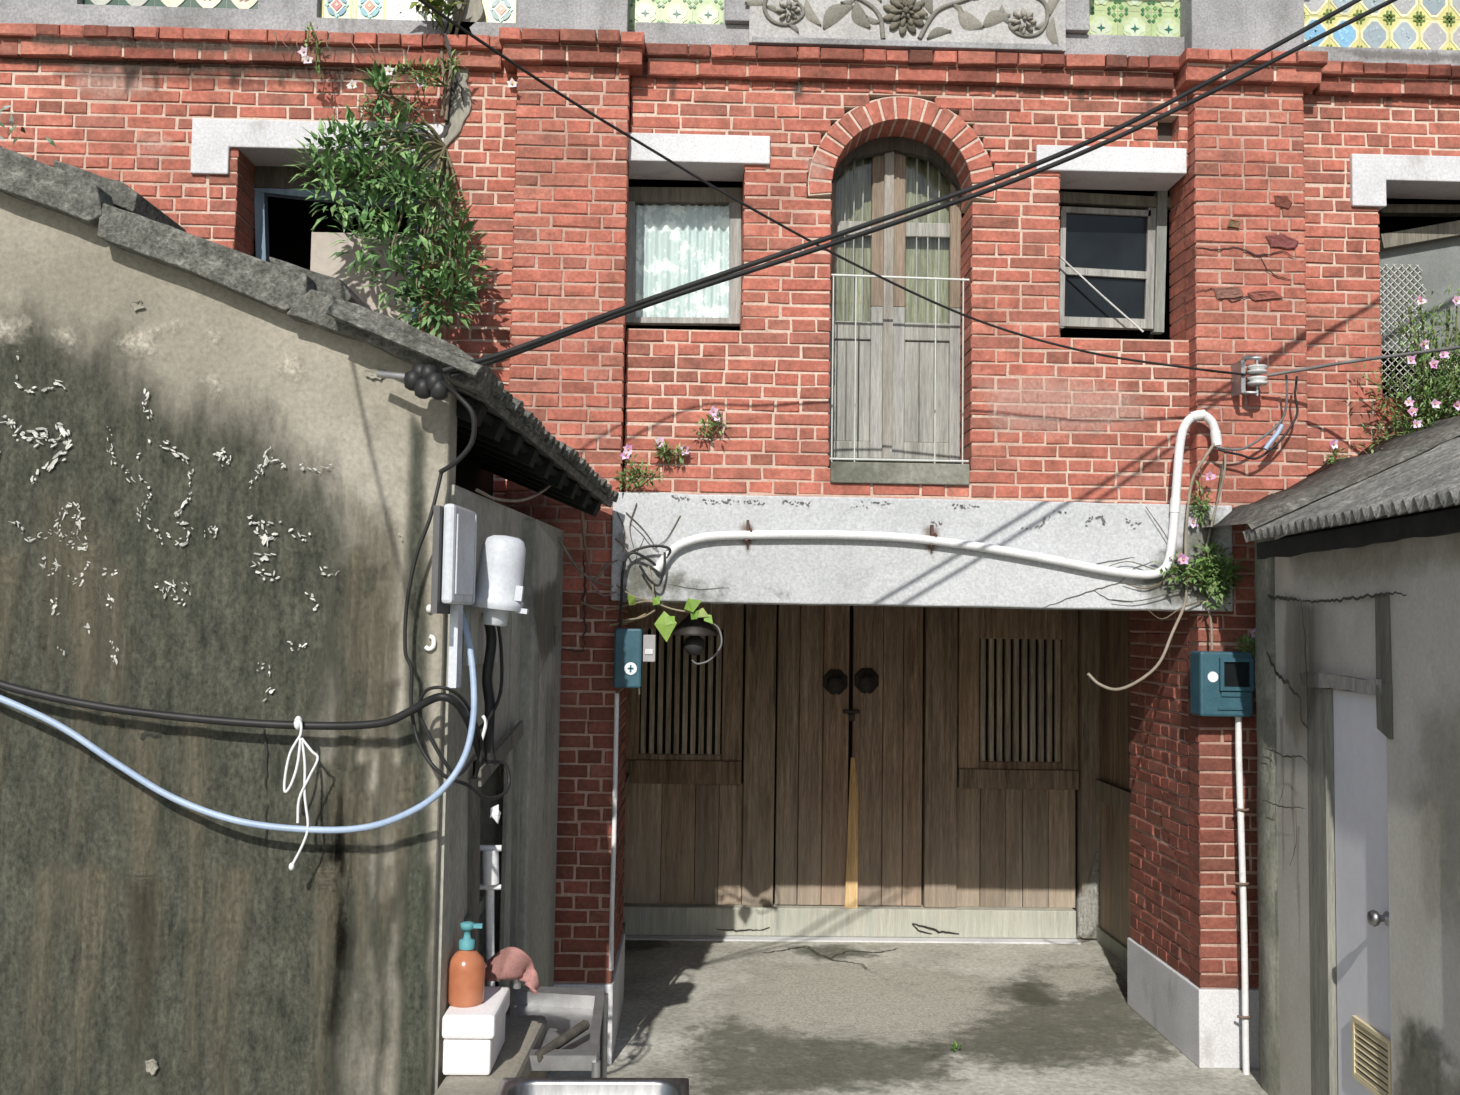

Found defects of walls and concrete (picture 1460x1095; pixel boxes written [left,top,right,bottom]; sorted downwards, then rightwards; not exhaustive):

peeling [15,356,66,393]
peeling [0,415,72,484]
peeling [9,502,117,587]
peeling [107,426,218,546]
peeling [154,580,191,606]
peeling [247,515,311,581]
peeling [250,446,332,488]
leakage [52,515,161,1006]
leakage [314,530,415,1095]
crack [1260,591,1407,865]
leakage [33,867,110,1040]
leakage [185,722,251,1076]